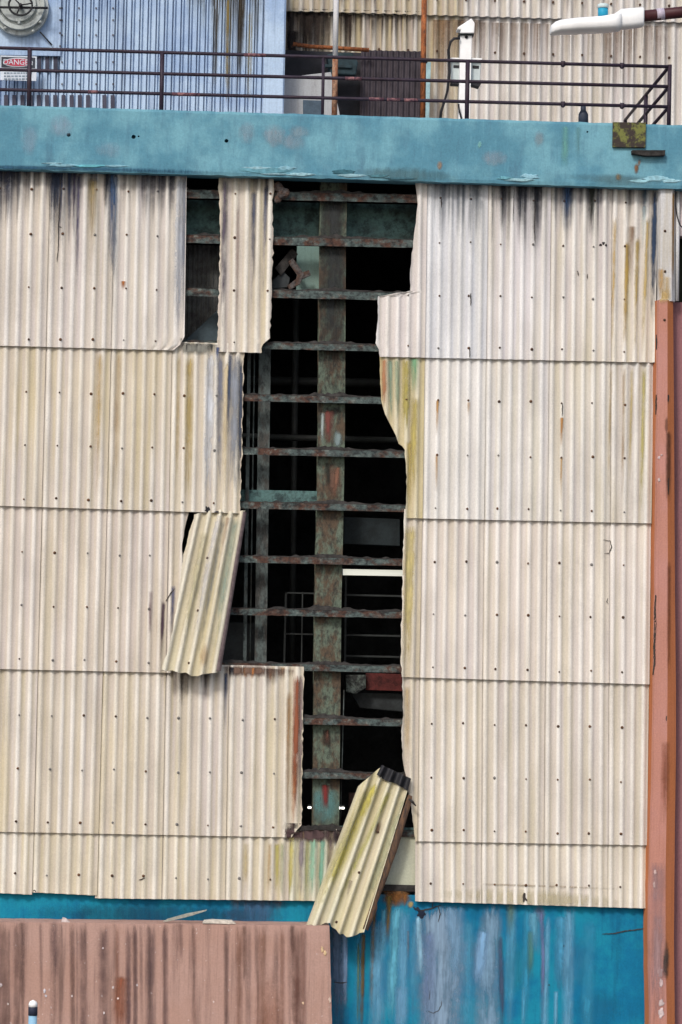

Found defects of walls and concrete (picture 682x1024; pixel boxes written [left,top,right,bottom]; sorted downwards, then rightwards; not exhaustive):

damp [0,166,188,302]
rust [274,182,290,203]
damp [555,177,657,288]
rust [321,408,341,445]
rust [382,359,417,473]
rust [403,530,414,649]
rust [227,666,303,799]
rust [357,891,413,1019]
rust [652,916,668,986]